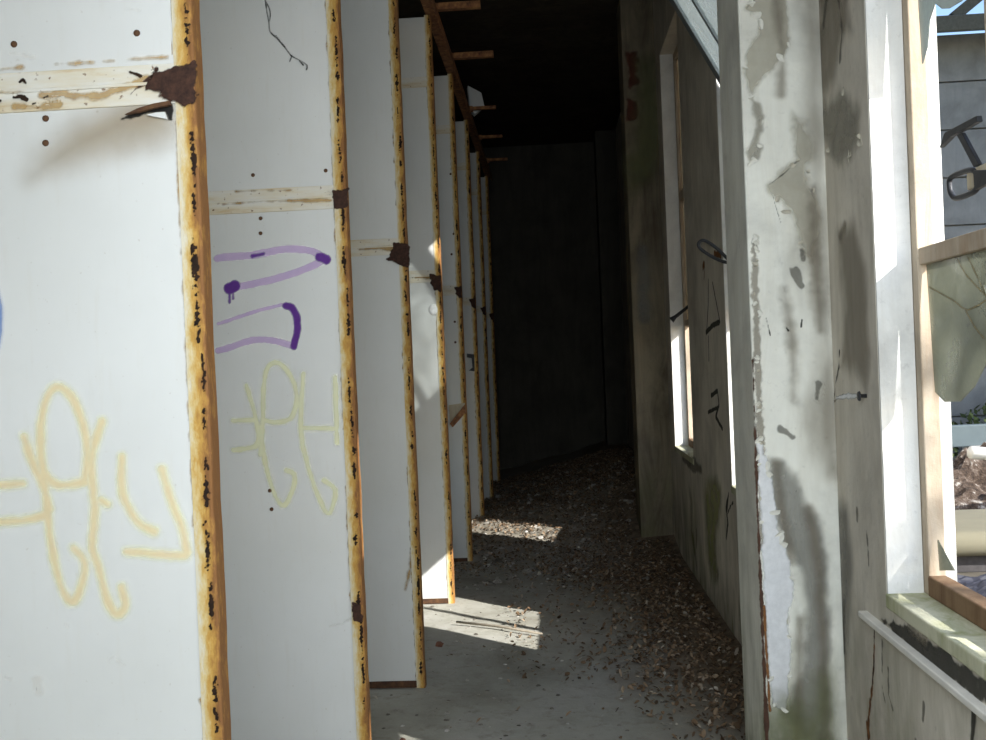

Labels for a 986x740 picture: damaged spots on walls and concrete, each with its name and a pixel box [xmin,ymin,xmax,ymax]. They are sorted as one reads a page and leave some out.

corrosion [39,3,199,109]
peeling [742,0,790,167]
peeling [823,87,862,164]
peeling [768,124,818,257]
corrosion [341,377,357,479]
corrosion [349,591,365,684]
corrosion [405,513,421,617]
peeling [755,436,796,713]
water stain [772,462,828,740]
crack [866,630,875,740]